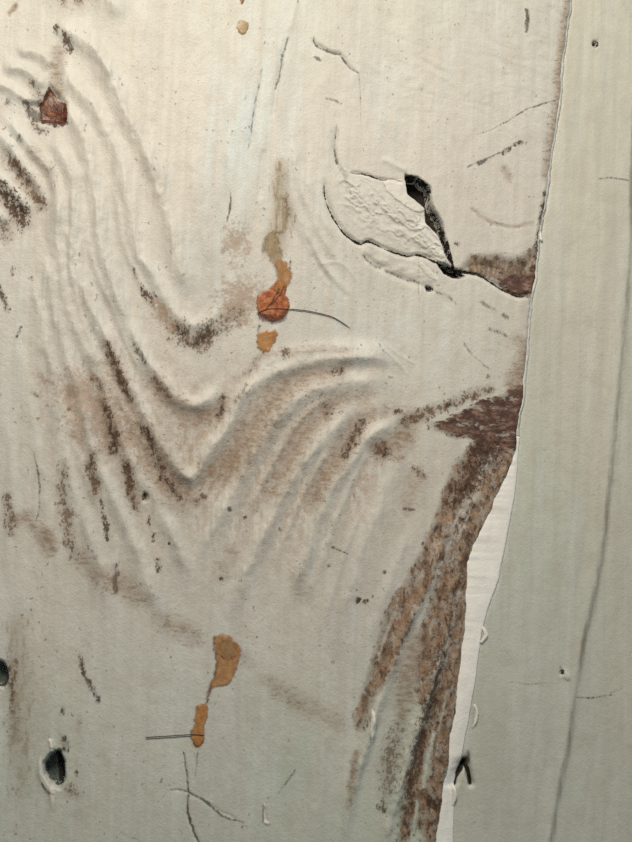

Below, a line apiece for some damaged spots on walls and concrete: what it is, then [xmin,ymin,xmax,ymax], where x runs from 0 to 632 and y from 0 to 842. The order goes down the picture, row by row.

water stain [0,149,48,240]
crack [323,135,525,298]
water stain [309,415,375,505]
water stain [353,352,526,842]
spalling [436,436,520,842]
crack [181,752,236,842]